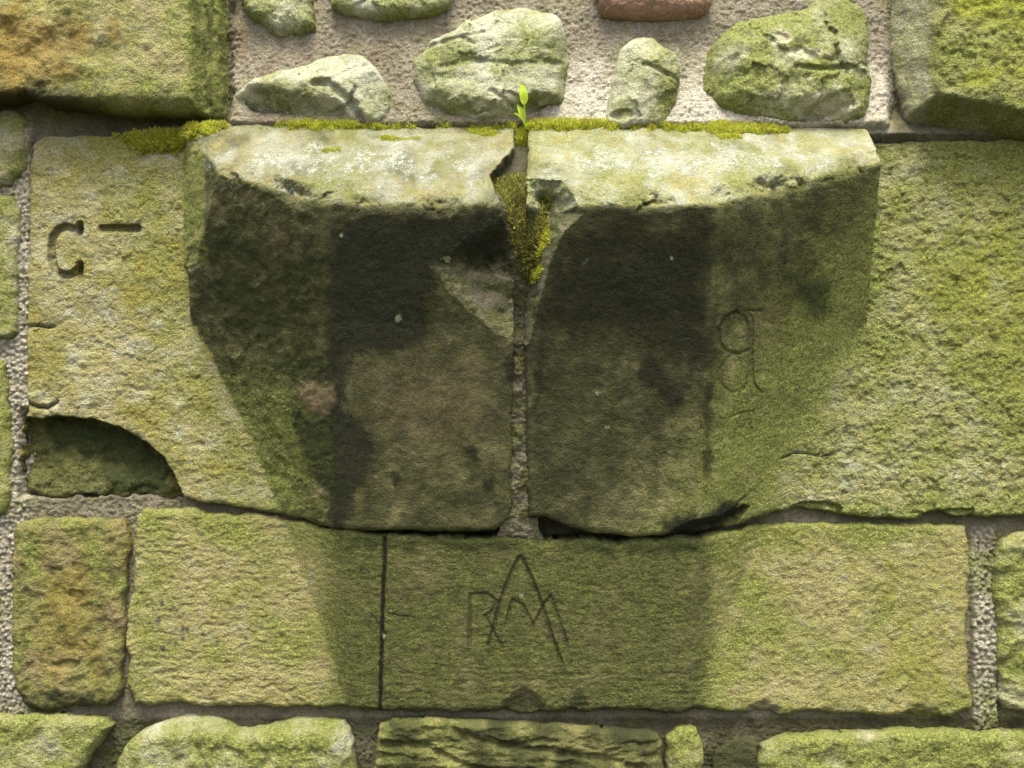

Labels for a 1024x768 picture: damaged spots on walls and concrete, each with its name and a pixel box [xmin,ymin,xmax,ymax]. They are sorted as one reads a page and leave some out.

crack [370,538,410,710]